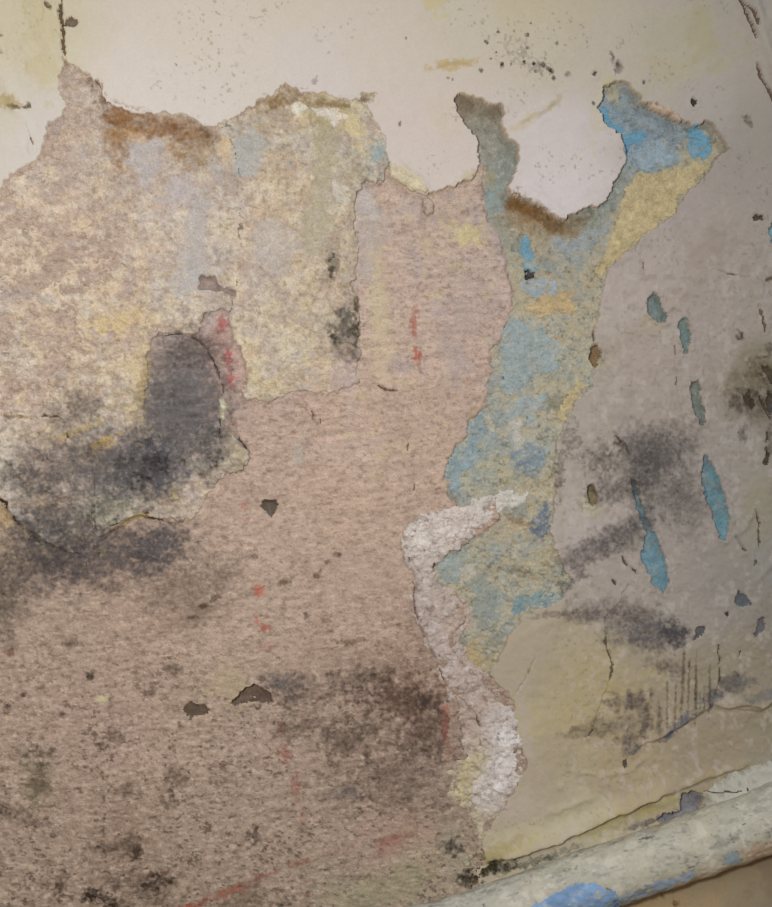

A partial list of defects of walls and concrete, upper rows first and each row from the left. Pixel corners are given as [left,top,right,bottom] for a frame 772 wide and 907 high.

crack [739,0,760,38]
corrosion [105,107,188,140]
crack [757,64,772,101]
peeling [432,83,725,674]
water stain [1,334,232,594]
flaking render [0,58,528,907]
peeling [701,455,731,541]
peeling [734,590,752,607]
crack [603,633,614,680]
water stain [354,671,447,754]